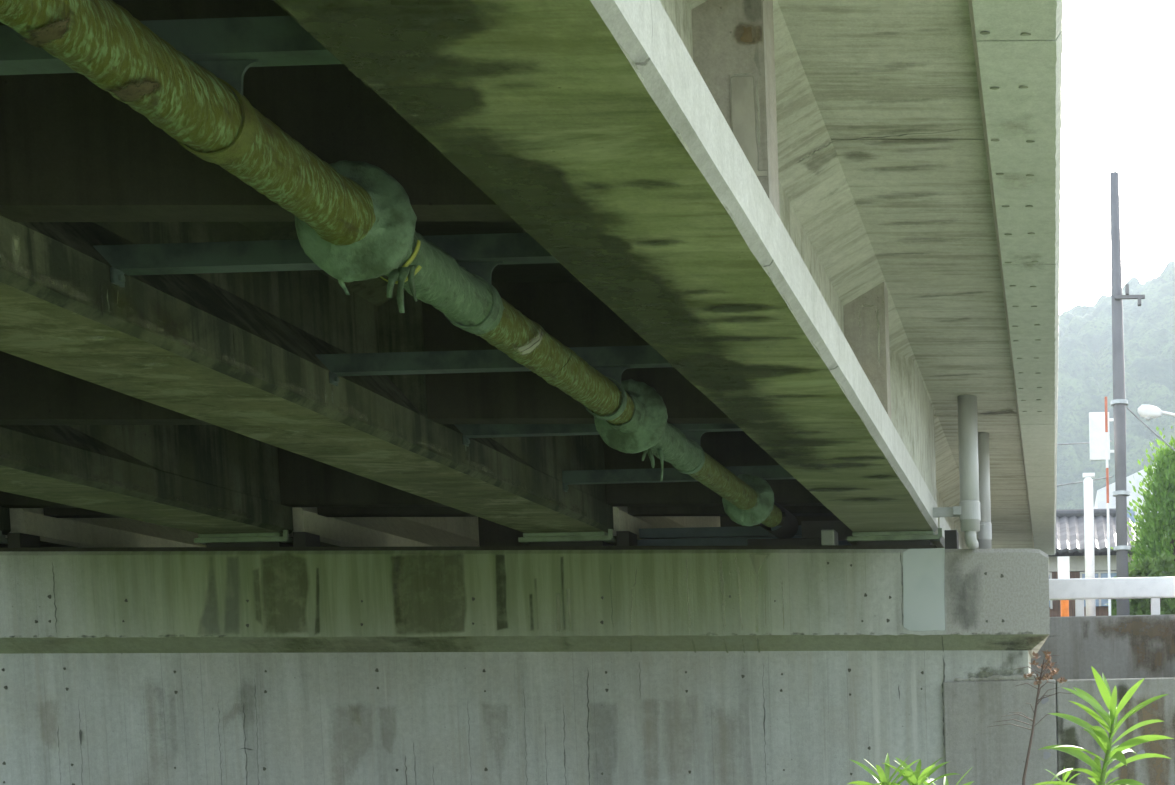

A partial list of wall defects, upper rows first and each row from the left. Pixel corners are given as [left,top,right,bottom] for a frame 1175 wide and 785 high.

water stain [273,0,893,501]
rust [735,25,762,44]